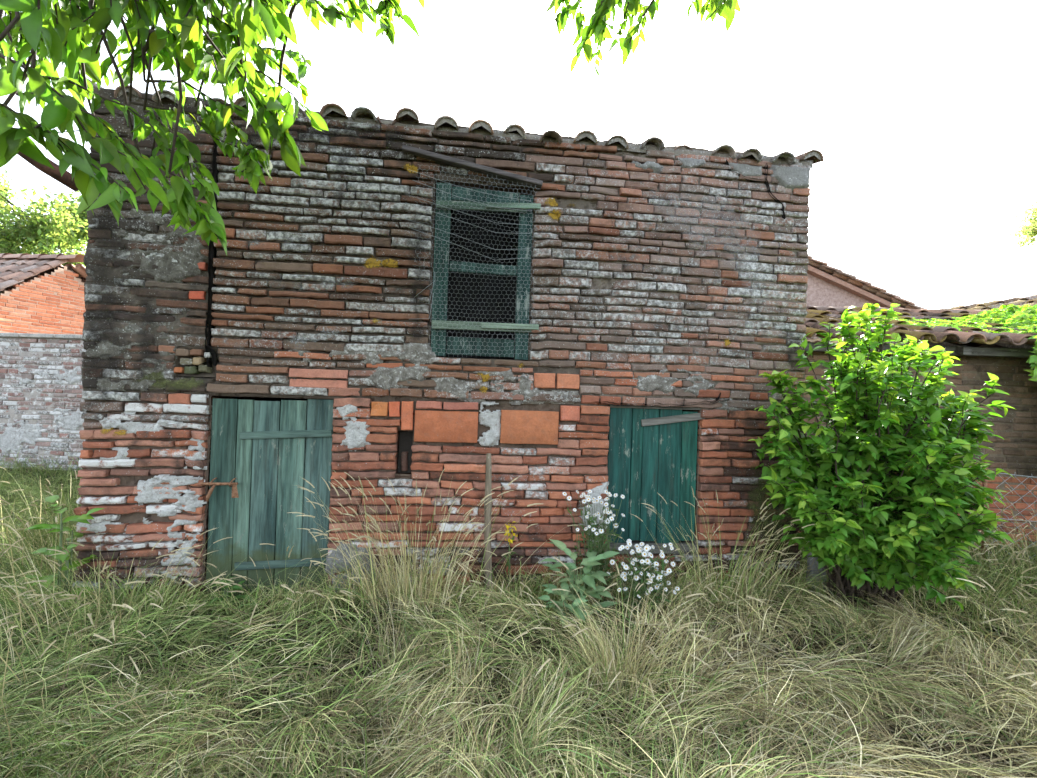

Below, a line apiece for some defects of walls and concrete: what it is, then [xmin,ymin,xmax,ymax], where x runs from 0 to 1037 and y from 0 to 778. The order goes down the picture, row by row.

flaking render [336,404,371,451]
flaking render [134,438,207,580]